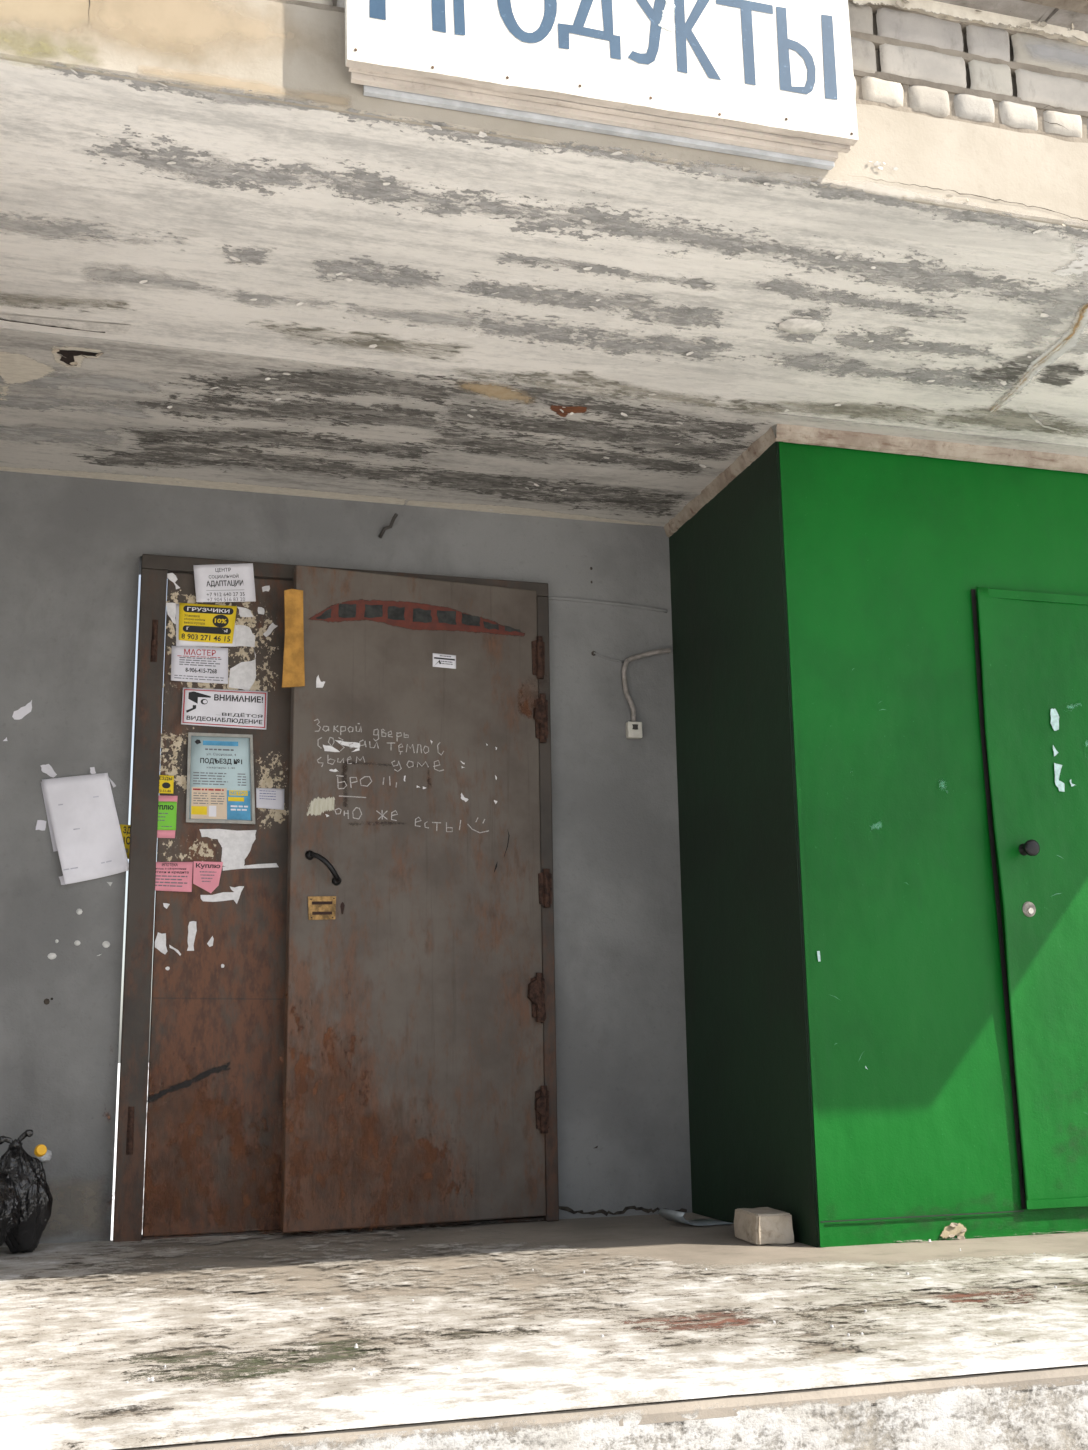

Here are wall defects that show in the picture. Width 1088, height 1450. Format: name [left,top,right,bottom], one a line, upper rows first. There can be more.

crack [867,177,1088,221]
peeling [0,214,149,251]
peeling [34,62,1088,398]
peeling [0,294,129,312]
peeling [0,346,104,400]
crack [990,304,1088,432]
peeling [0,466,653,525]